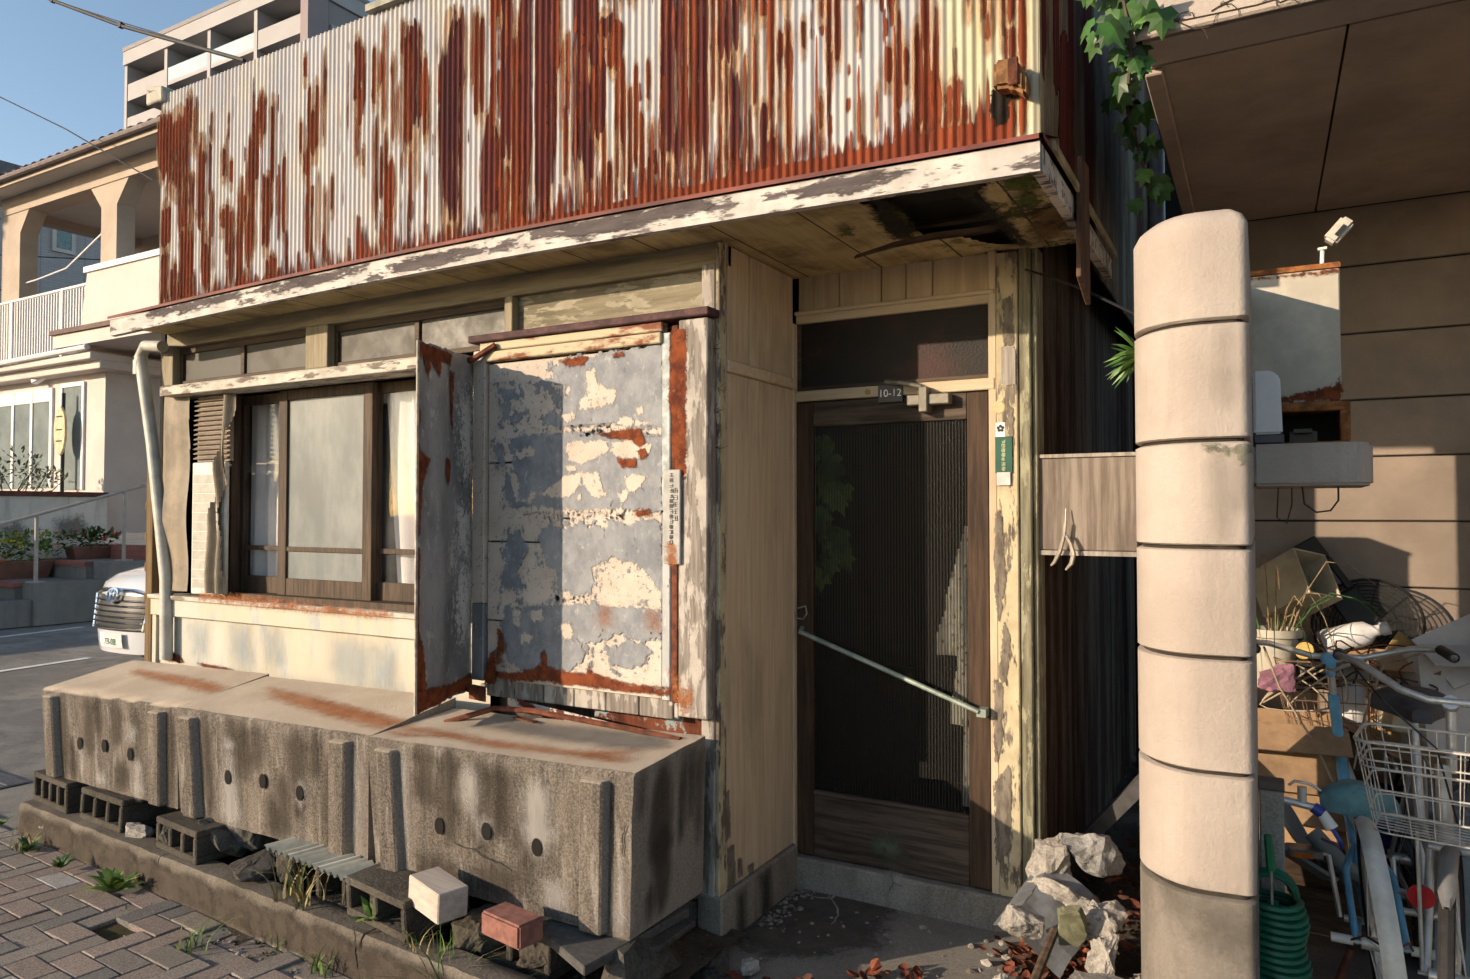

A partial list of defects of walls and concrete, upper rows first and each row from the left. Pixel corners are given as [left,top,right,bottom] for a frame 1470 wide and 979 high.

rust [157,0,1027,304]
rust [966,0,1092,225]
peeling [445,344,663,678]
rust [600,428,648,468]
peeling [1002,293,1015,347]
peeling [1007,404,1015,491]
rust [1281,377,1344,403]
rust [136,652,230,692]
rust [272,444,693,761]
peeling [992,510,1012,864]
leakage [415,751,549,895]
leakage [649,763,694,915]